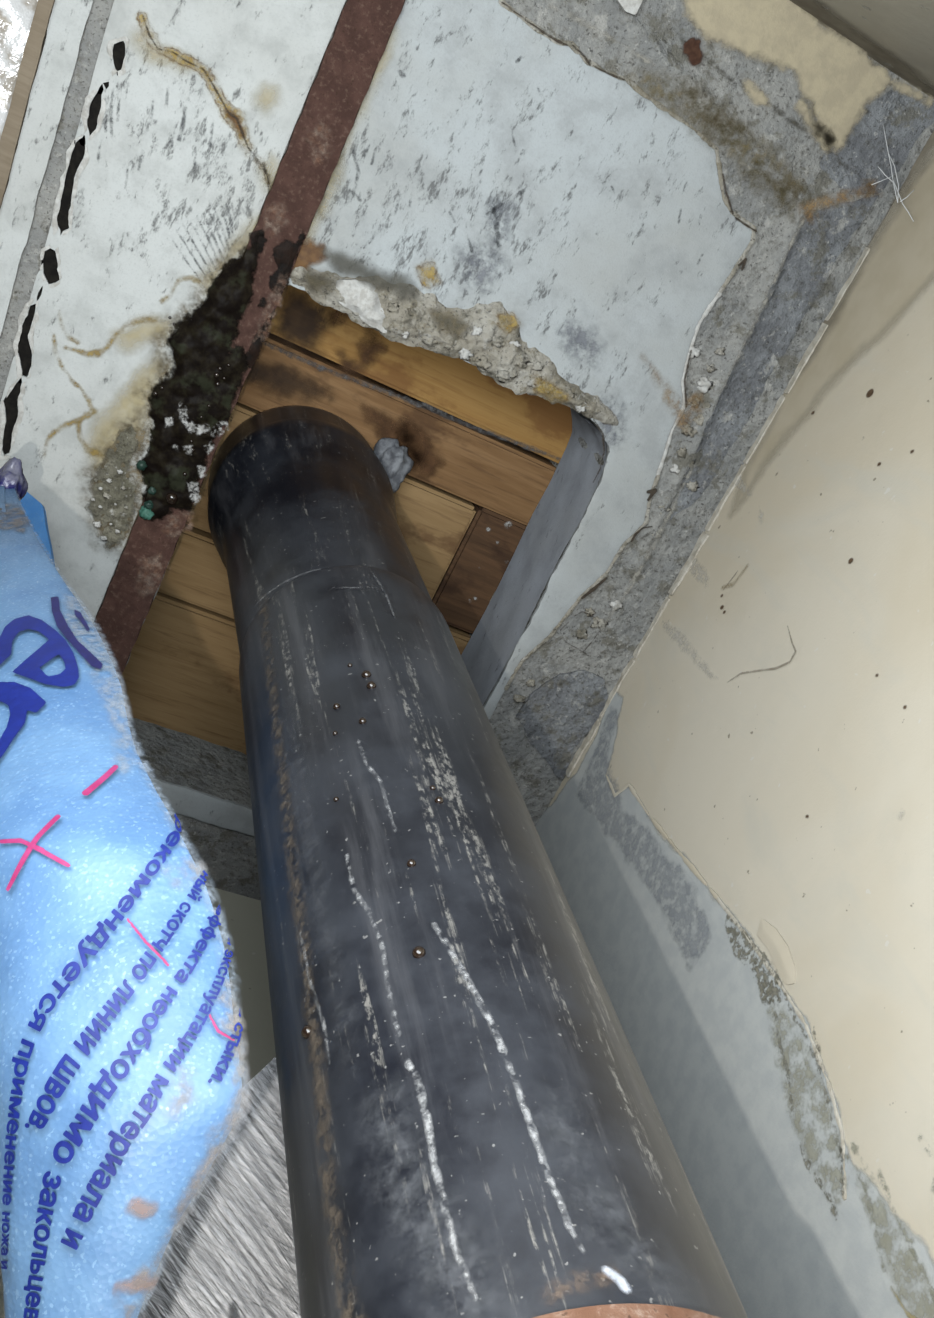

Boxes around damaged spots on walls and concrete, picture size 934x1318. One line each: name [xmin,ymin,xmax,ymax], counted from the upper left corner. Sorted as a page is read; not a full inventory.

rust [153,48,252,148]
damp [790,0,934,99]
rust [293,239,438,299]
damp [48,160,348,548]
damp [342,327,385,373]
rust [434,313,467,335]
spalling [289,266,619,426]
damp [735,131,934,508]
damp [363,406,441,477]
spalling [489,0,934,1318]